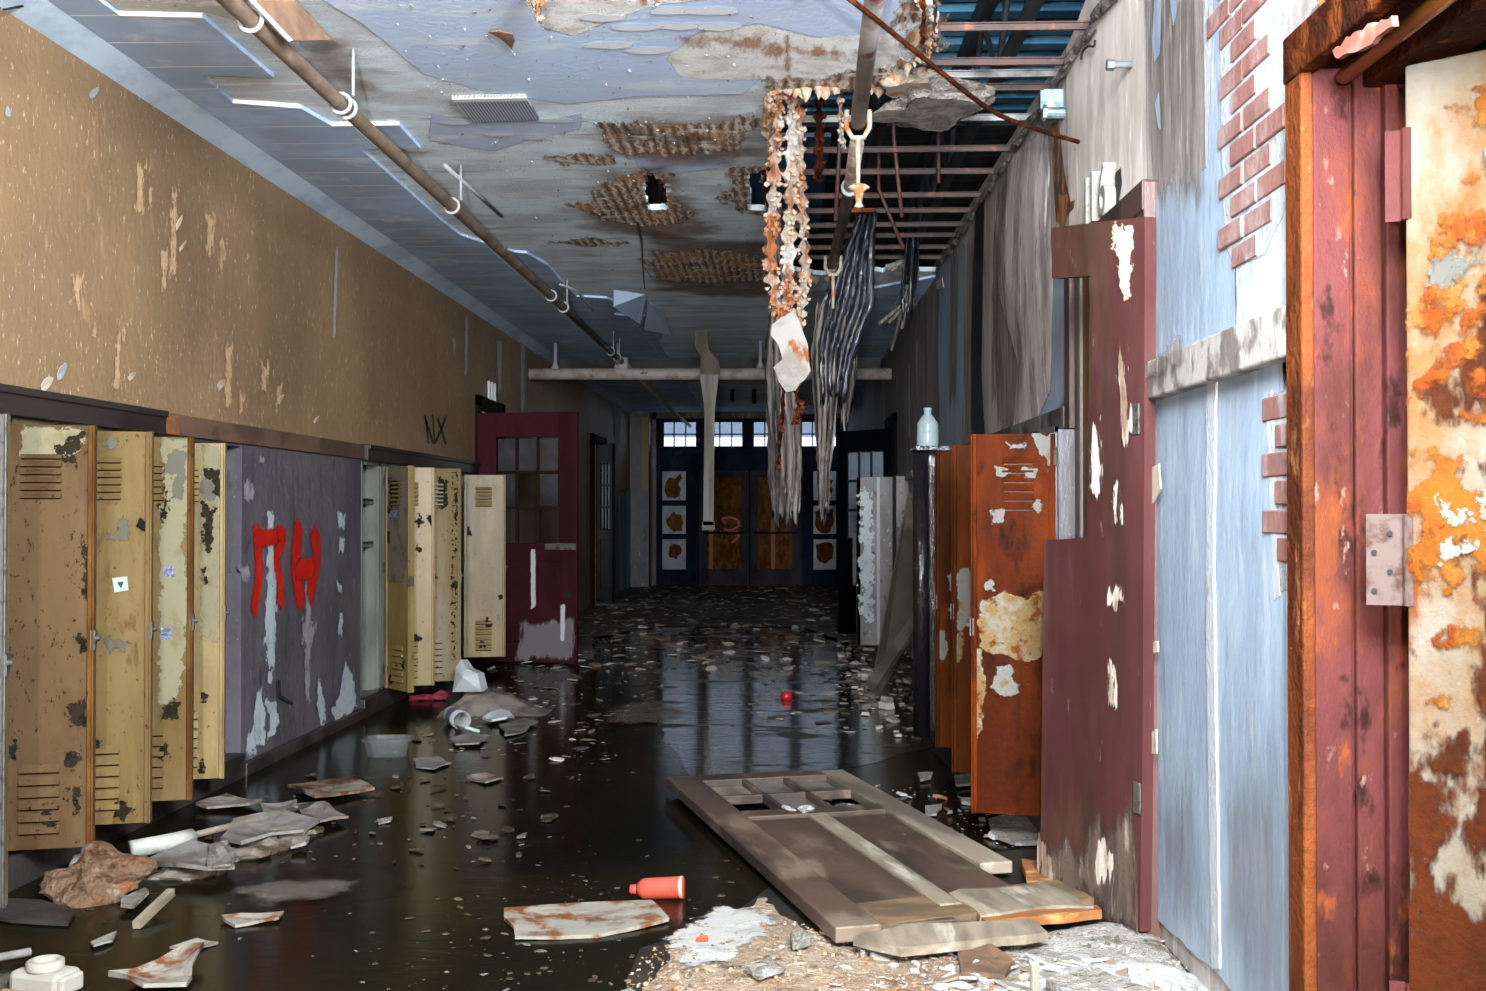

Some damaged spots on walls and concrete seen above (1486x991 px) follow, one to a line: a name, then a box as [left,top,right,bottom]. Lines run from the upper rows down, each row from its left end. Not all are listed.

flaking render [488,30,515,49]
rust [725,38,789,71]
flaking render [904,0,938,76]
flaking render [543,154,598,165]
flaking render [1207,0,1286,269]
rust [1444,86,1486,128]
leakage [992,168,1018,430]
peeling [1111,221,1134,301]
rust [1427,208,1486,261]
rust [1405,274,1486,426]
peeling [1152,464,1162,503]
rust [1407,446,1486,991]